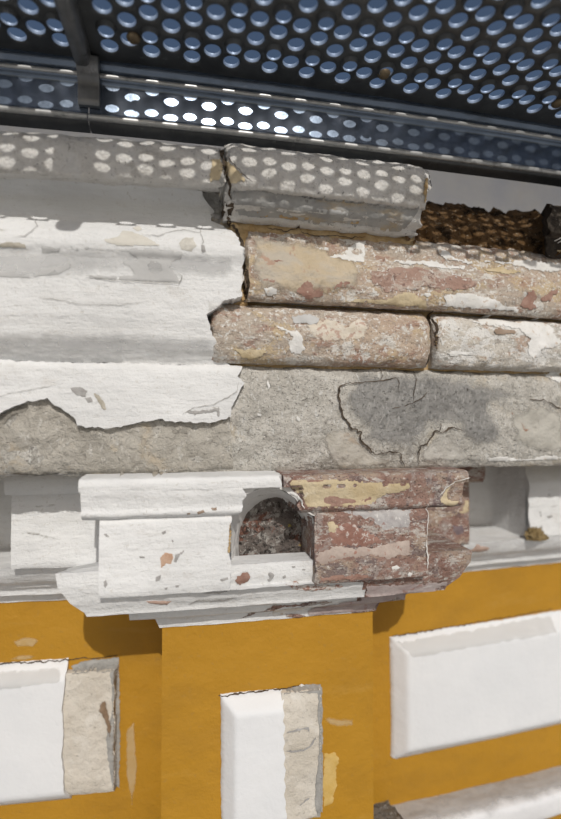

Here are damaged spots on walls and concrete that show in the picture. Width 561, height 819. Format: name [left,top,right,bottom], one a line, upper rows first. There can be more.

peeling [0,261,70,278]
peeling [86,226,206,284]
flaking render [290,281,323,299]
peeling [278,314,368,354]
peeling [317,241,366,262]
flaking render [370,249,561,359]
spalling [0,385,238,477]
crack [337,309,461,467]
flaking render [243,465,489,618]
peeling [71,657,121,790]
peeling [284,684,339,817]